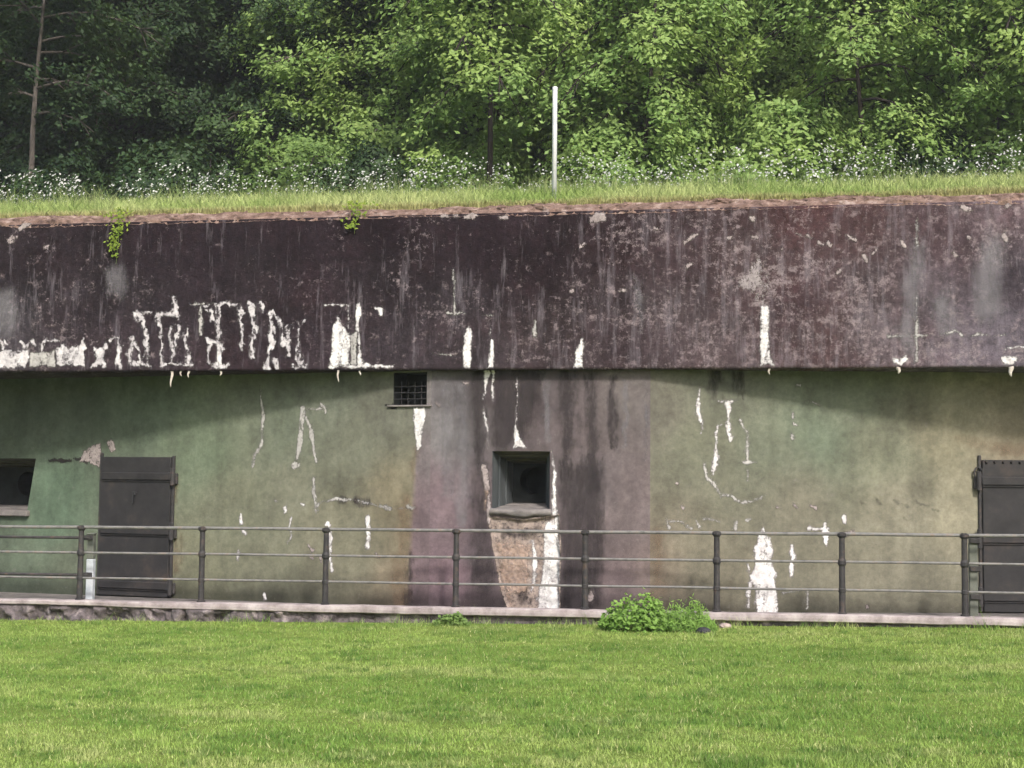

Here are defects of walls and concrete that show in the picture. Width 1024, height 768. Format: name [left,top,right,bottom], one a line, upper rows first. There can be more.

peeling [0,339,36,350]
damp [108,296,307,387]
peeling [79,440,115,467]
damp [560,338,618,607]
spalling [480,458,562,608]